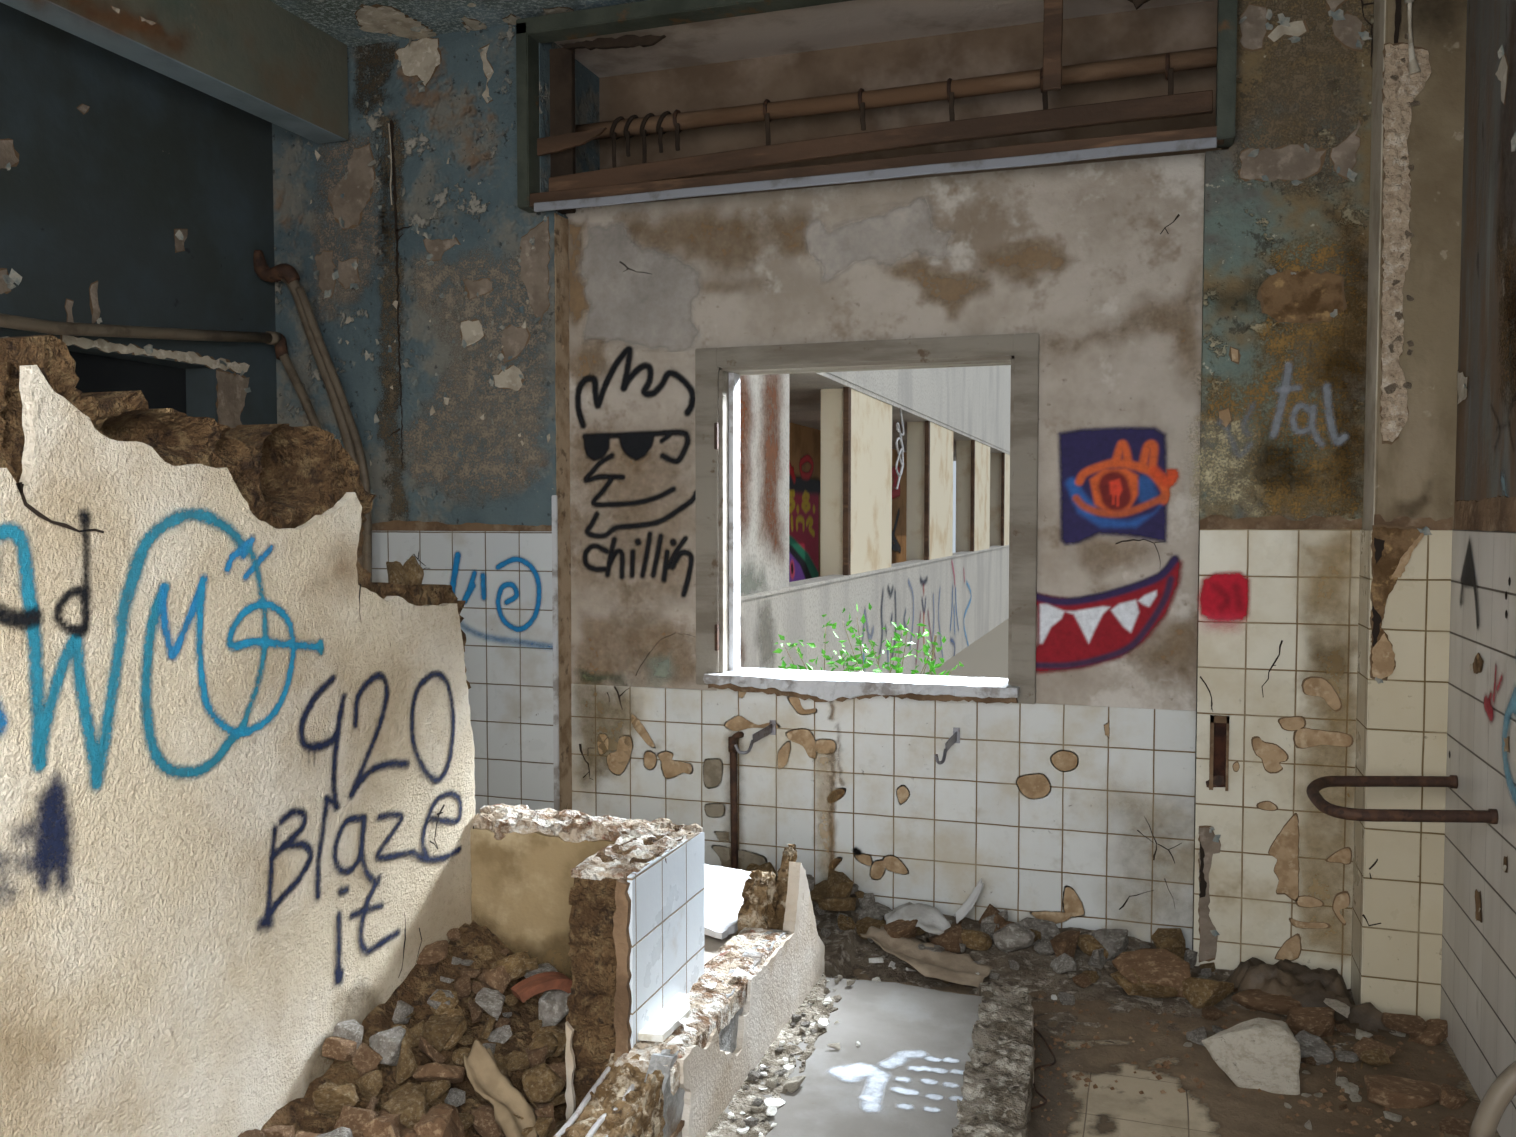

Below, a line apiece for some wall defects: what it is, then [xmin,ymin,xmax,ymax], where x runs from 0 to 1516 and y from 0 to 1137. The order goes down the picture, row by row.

peeling [354,4,442,113]
damp [568,223,591,322]
damp [633,217,807,263]
damp [893,243,1066,313]
peeling [60,280,251,428]
peeling [1193,0,1432,684]
crack [16,482,104,533]
spalling [597,714,767,871]
spalling [724,691,837,769]
spalling [1016,750,1079,800]
spalling [1198,825,1221,963]
spalling [1256,801,1352,961]